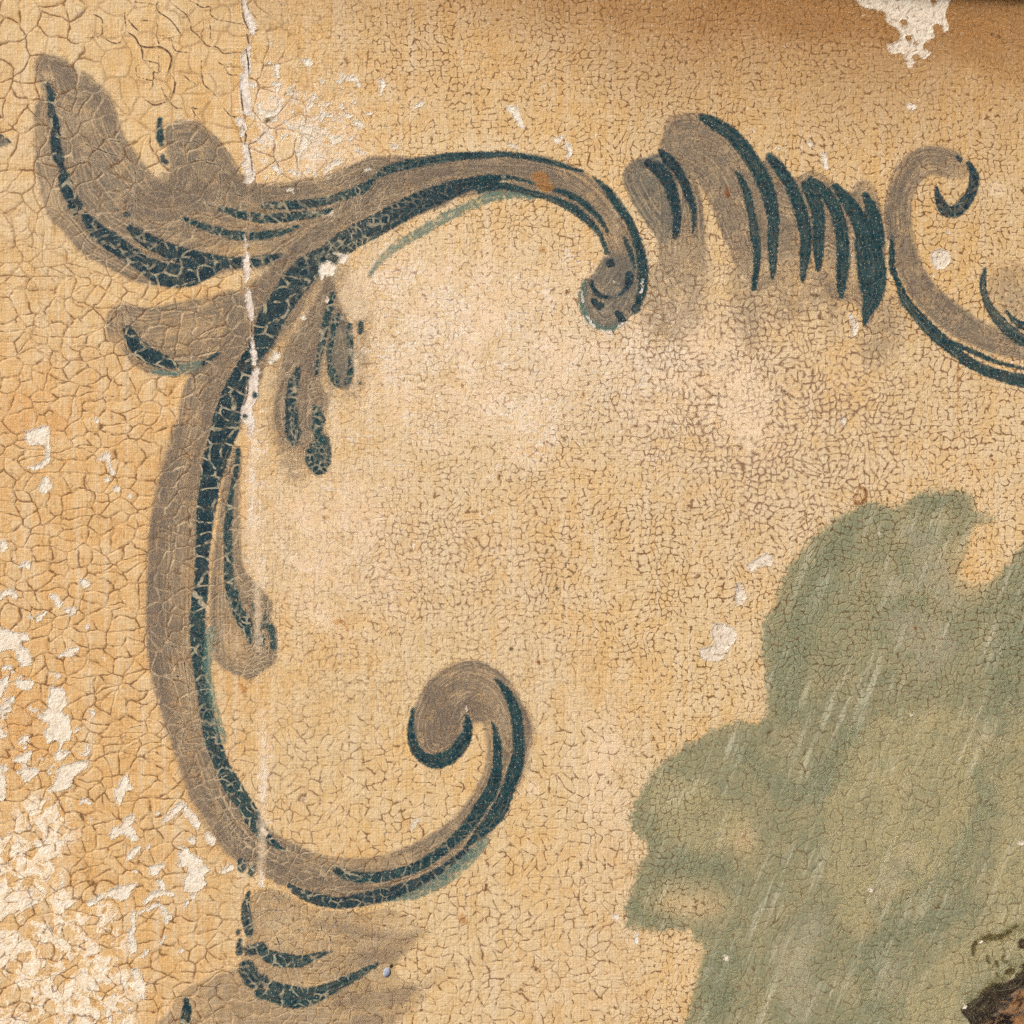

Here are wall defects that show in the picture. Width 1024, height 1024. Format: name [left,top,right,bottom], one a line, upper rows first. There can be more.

peeling [857,0,950,68]
crack [84,0,261,438]
peeling [24,425,53,494]
crack [247,469,255,522]
peeling [0,587,18,600]
peeling [27,593,77,622]
peeling [699,622,737,661]
peeling [746,552,774,572]
crack [171,645,199,750]
peeling [0,626,234,1024]
crack [228,755,268,843]
crack [259,870,331,945]